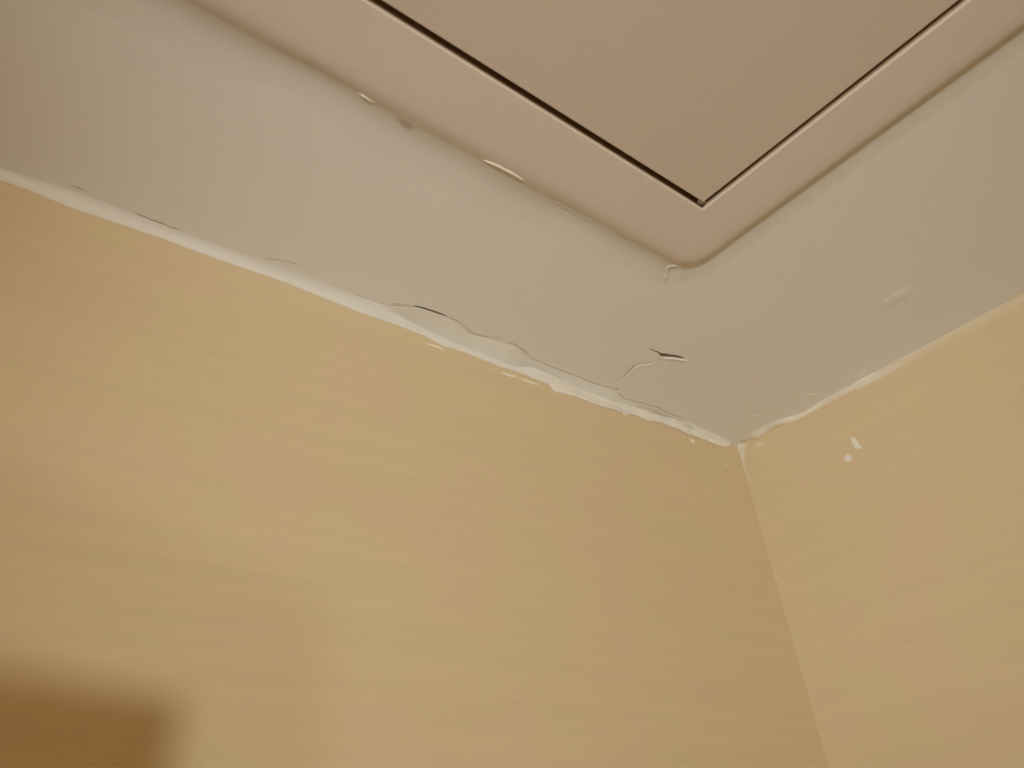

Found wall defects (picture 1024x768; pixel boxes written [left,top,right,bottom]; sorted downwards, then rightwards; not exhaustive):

peeling [484,160,525,181]
crack [389,304,691,420]